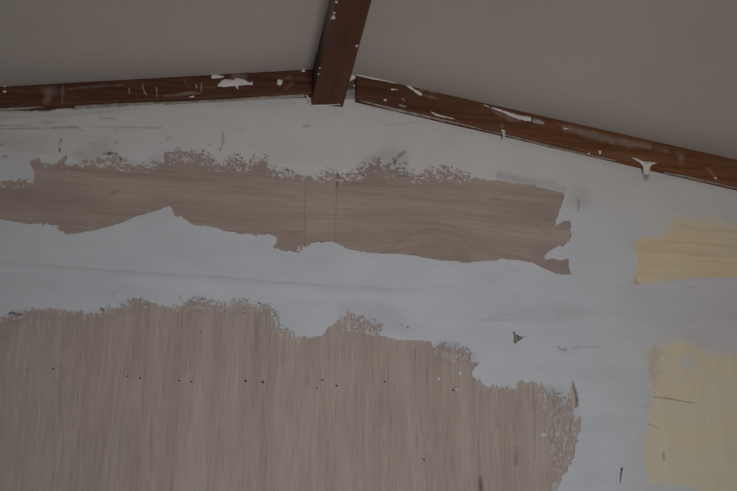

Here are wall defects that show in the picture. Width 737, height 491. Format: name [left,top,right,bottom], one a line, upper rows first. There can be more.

peeling [0,146,571,275]
peeling [632,206,737,287]
peeling [0,296,580,491]
peeling [638,335,737,491]